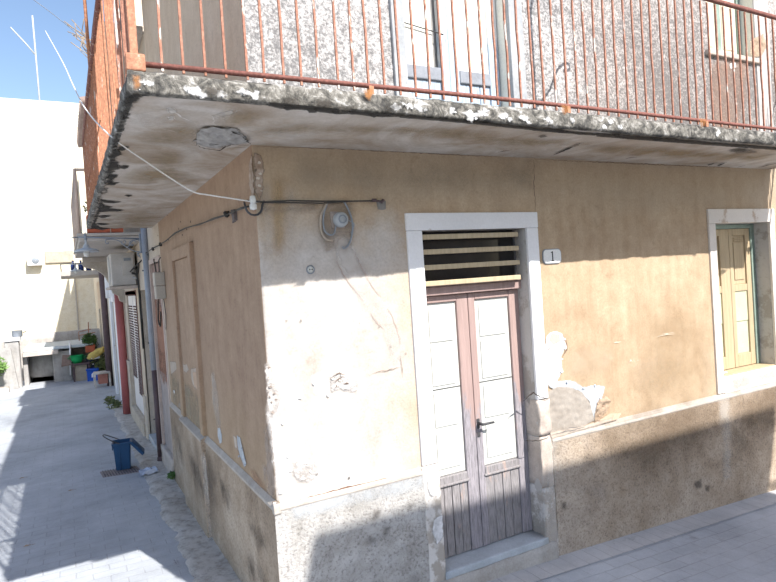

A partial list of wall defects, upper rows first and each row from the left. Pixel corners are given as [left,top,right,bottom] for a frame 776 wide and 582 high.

water stain [90,94,142,230]
spalling [249,153,264,199]
peeling [158,345,197,393]
spalling [330,372,358,392]
peeling [545,331,611,422]